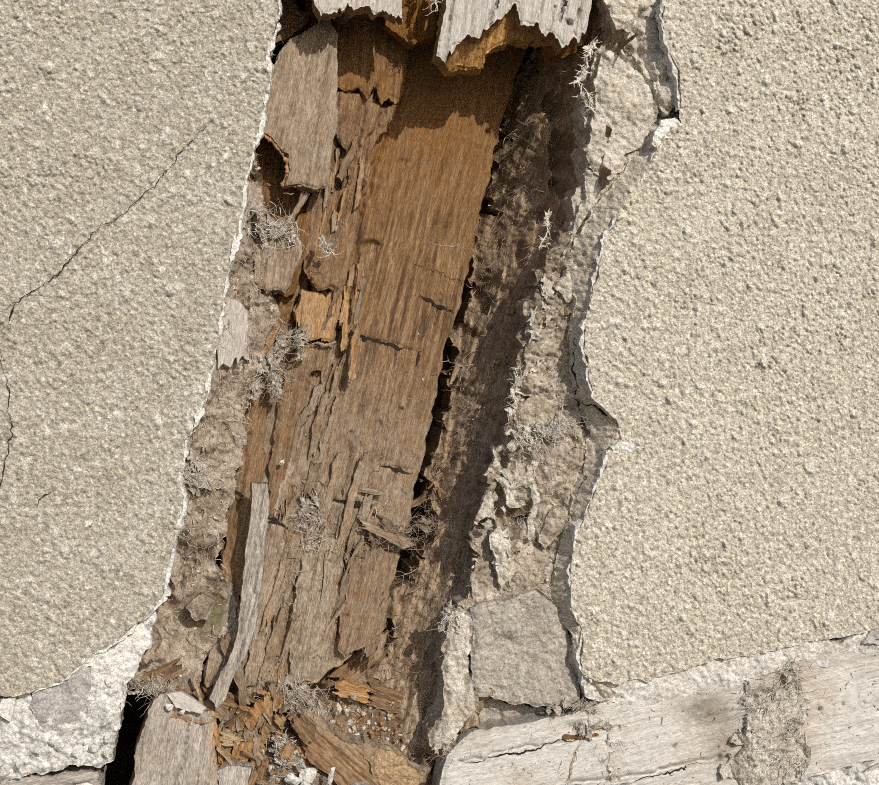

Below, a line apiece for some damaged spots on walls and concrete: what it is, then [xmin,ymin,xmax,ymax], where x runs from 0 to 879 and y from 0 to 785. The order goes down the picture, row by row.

crack [0,353,14,486]
crack [1,120,213,323]
spalling [0,0,282,783]
spalling [374,0,879,760]